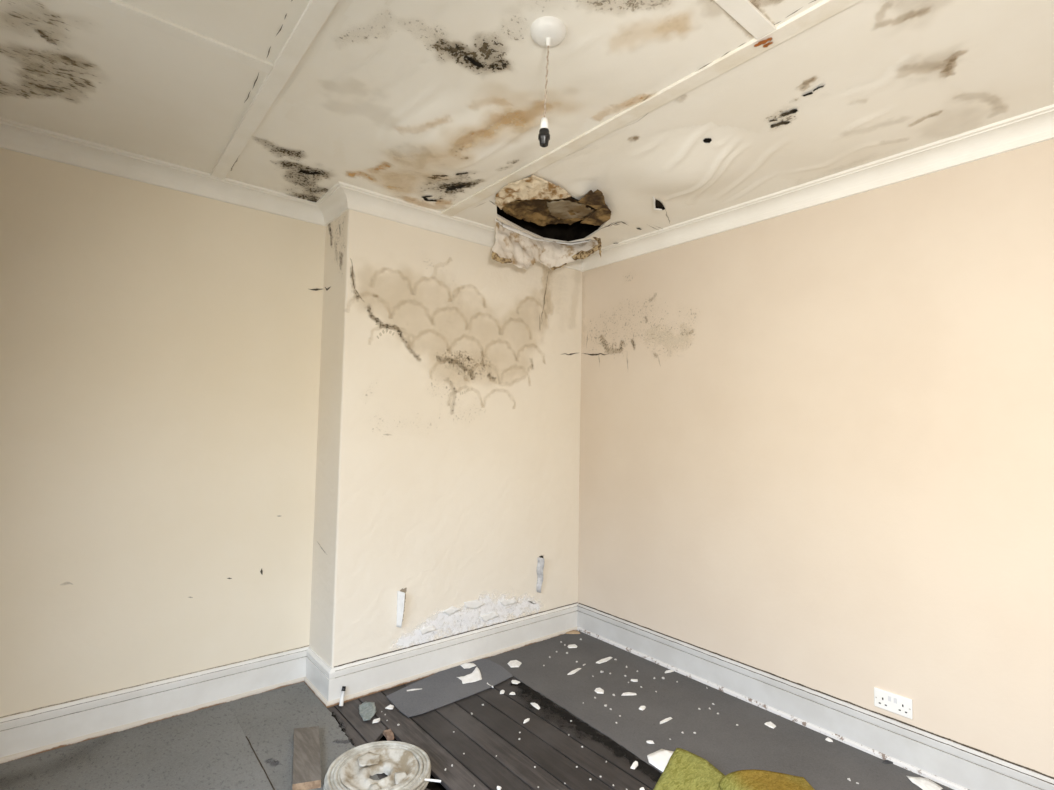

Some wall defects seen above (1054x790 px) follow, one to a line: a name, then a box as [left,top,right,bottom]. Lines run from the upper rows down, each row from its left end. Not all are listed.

leakage [0,4,97,101]
leakage [426,22,519,74]
leakage [766,109,798,128]
leakage [257,139,328,203]
leakage [422,172,483,202]
peeling [396,556,545,648]